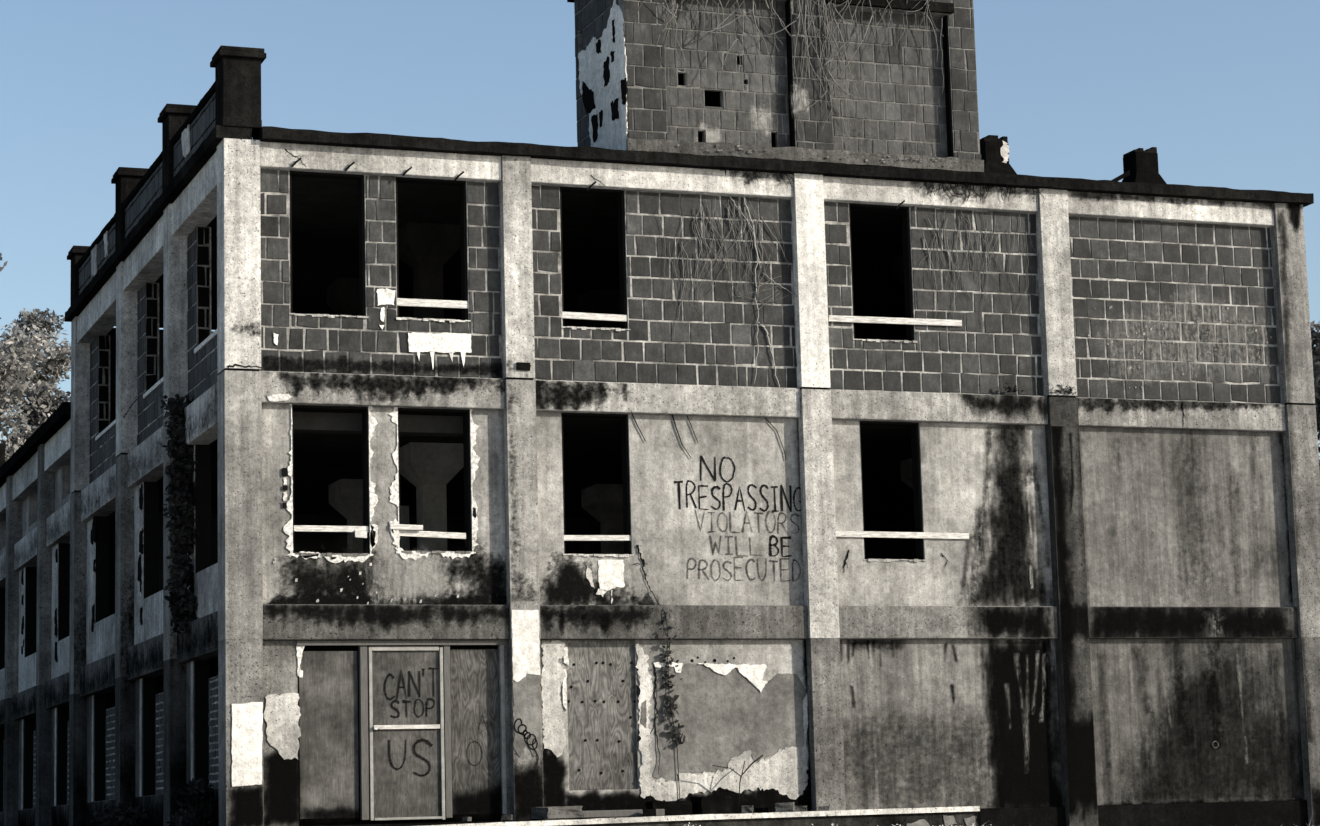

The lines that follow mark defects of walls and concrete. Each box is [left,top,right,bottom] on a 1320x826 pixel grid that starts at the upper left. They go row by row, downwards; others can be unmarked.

peeling [578,0,628,150]
damp [262,356,514,408]
spalling [267,394,480,604]
damp [263,505,659,635]
peeling [586,565,613,604]
crack [635,545,651,592]
damp [840,394,1320,826]
peeling [635,641,808,801]